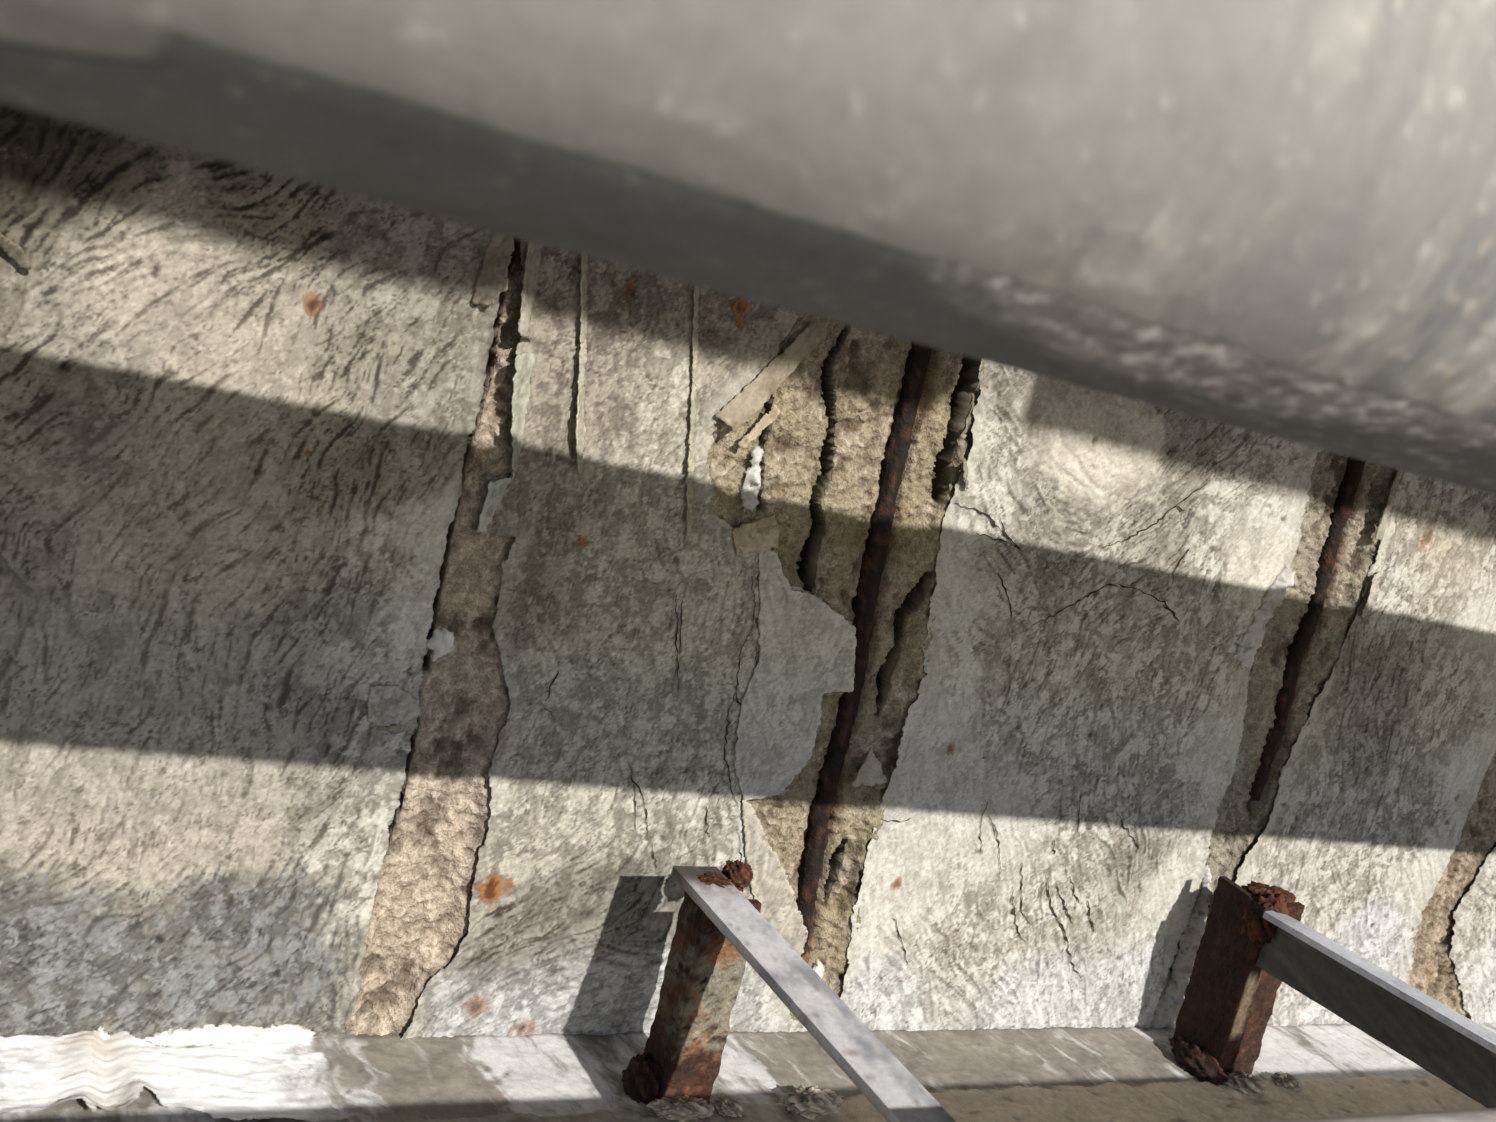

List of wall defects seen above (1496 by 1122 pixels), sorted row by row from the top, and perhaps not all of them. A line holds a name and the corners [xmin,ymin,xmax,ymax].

peeling [0,233,30,271]
spalling [346,232,542,1036]
spalling [685,285,989,998]
crack [931,355,1190,625]
crack [1103,482,1208,548]
spalling [1154,450,1403,1012]
spalling [1409,751,1496,1020]